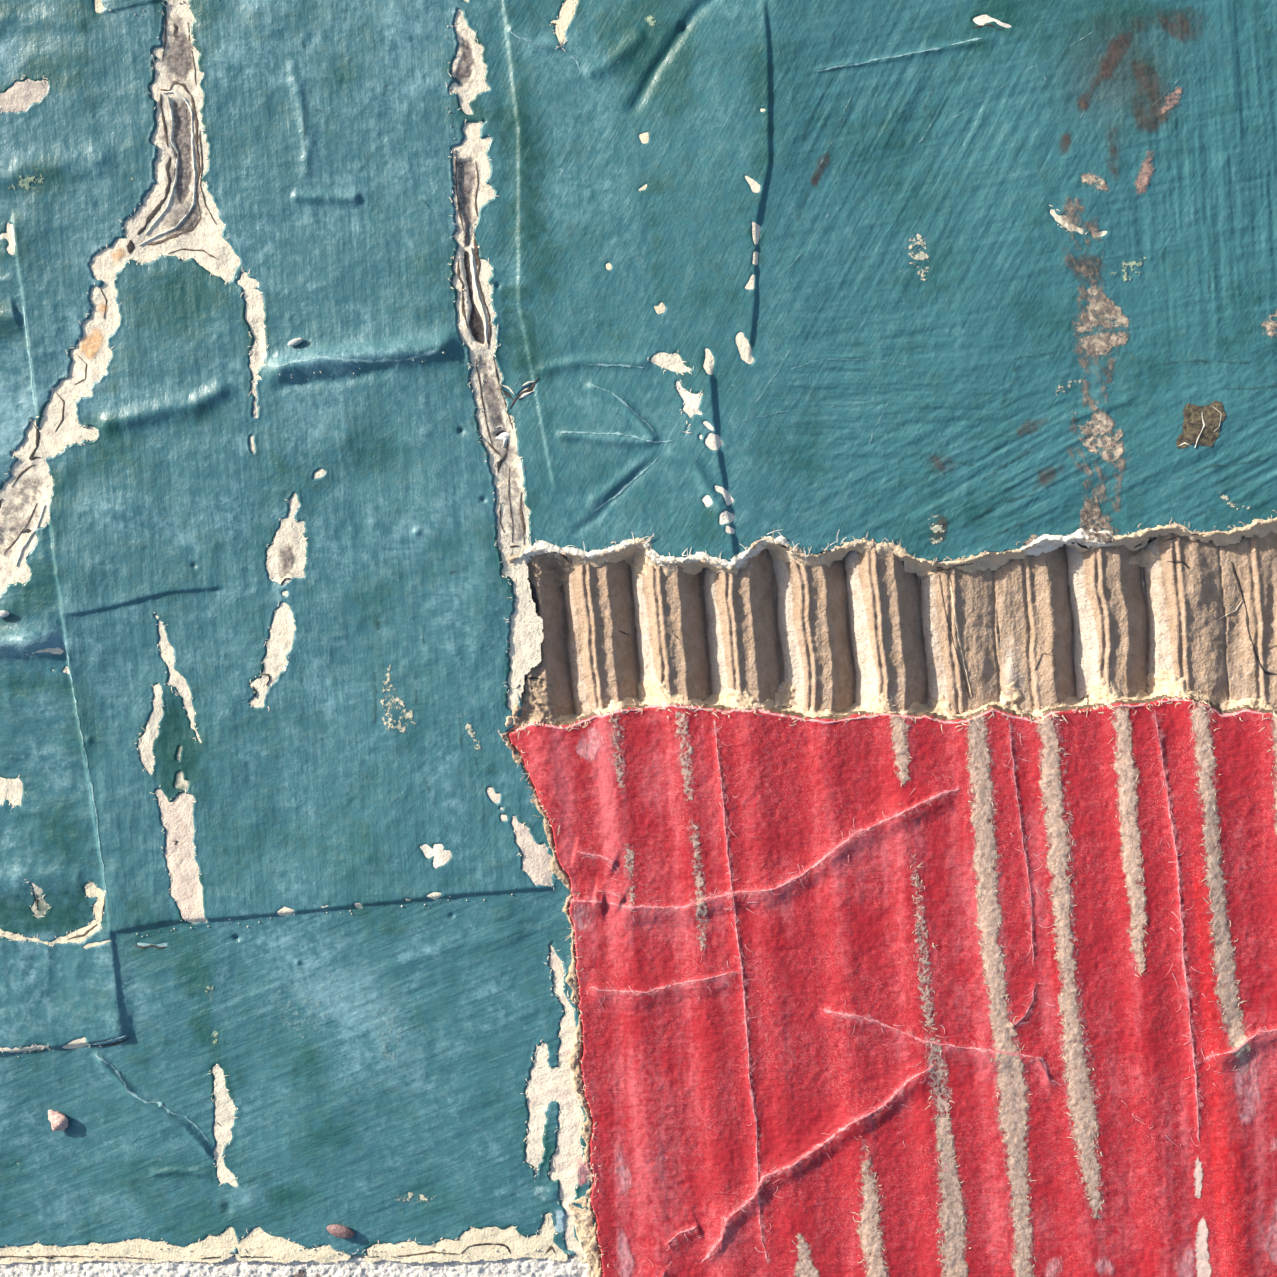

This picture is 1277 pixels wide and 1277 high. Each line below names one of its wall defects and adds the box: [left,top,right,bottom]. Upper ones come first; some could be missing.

peeling [0,75,49,113]
spalling [0,223,15,255]
peeling [249,493,307,712]
peeling [135,615,207,923]
peeling [0,879,111,949]
peeling [207,1064,238,1187]
peeling [234,1213,567,1264]